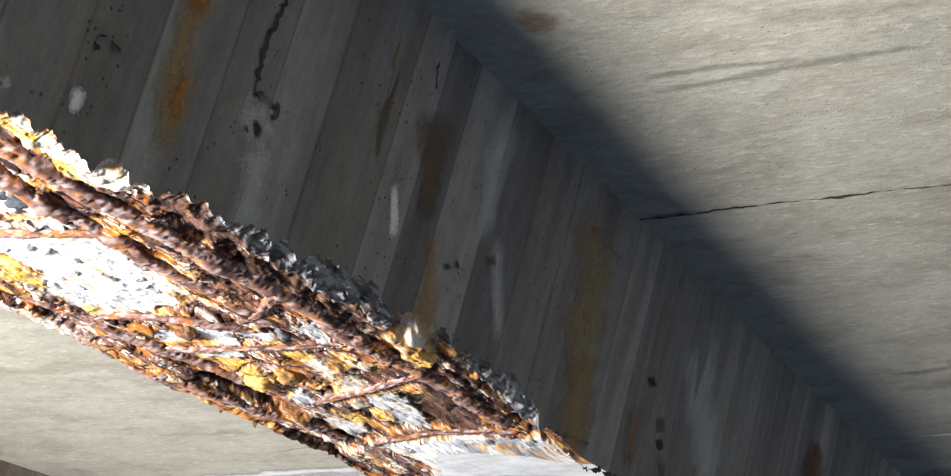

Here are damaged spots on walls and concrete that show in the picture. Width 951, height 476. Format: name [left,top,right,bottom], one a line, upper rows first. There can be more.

crack [253,0,289,118]
spalling [0,110,592,476]
rust [415,240,436,340]